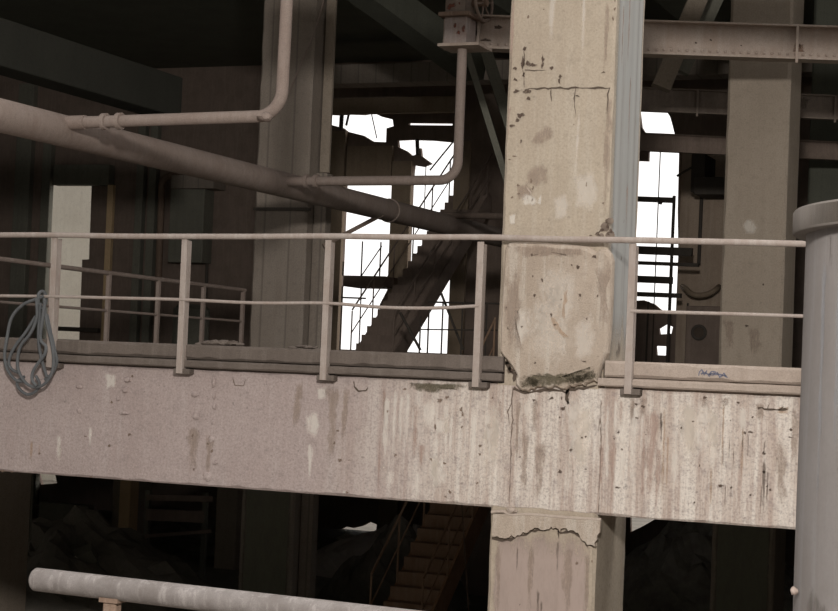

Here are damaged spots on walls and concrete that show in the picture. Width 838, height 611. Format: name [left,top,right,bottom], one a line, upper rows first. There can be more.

crack [522,54,610,113]
damp [411,383,463,392]
crack [505,360,602,512]